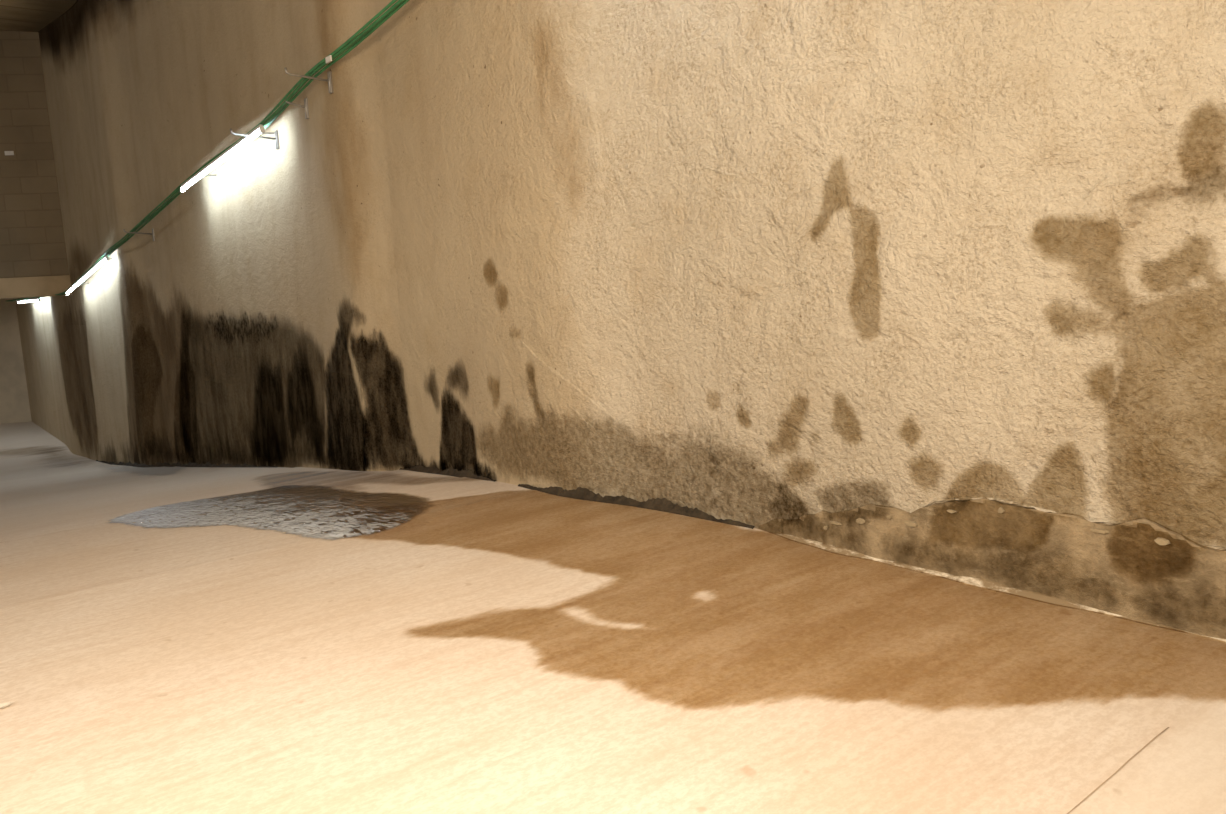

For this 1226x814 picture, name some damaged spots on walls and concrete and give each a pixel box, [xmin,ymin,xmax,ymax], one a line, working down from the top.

damp [97,278,495,481]